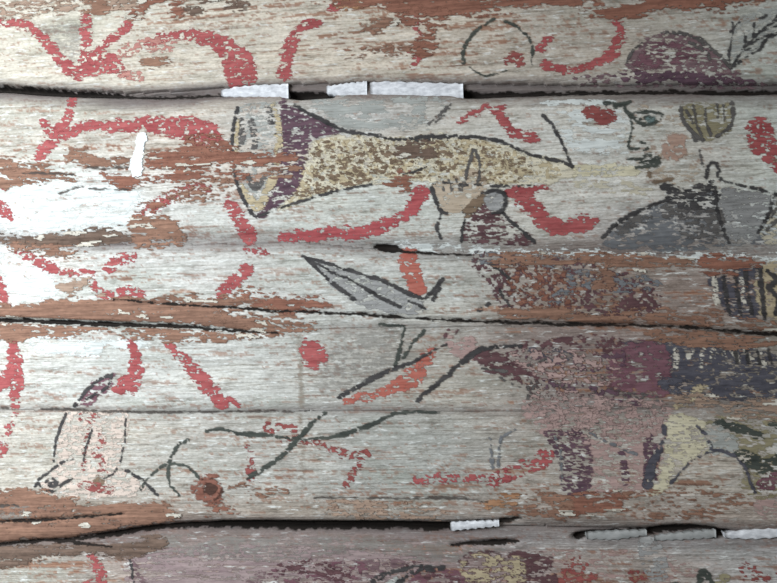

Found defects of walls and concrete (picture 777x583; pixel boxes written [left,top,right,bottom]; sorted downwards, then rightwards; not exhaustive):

peeling [0,0,250,22]
peeling [315,0,773,59]
peeling [138,56,172,69]
crack [0,84,222,99]
crack [288,92,335,100]
crack [463,89,777,99]
peeling [0,272,332,345]
crack [0,298,777,336]
crack [313,495,488,503]
peeling [0,487,181,570]
crack [0,504,521,548]
crack [573,524,728,539]